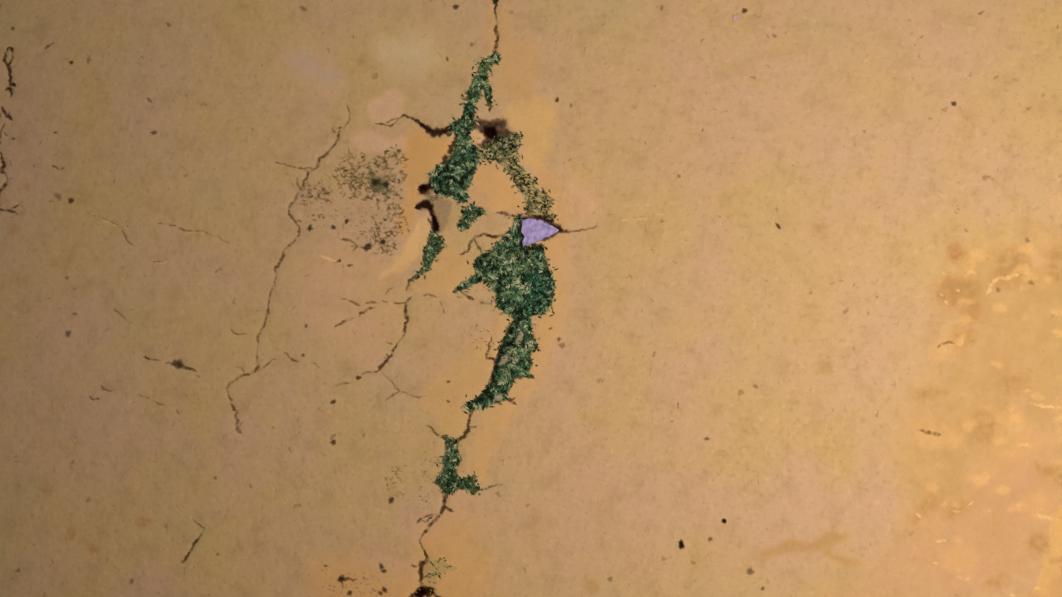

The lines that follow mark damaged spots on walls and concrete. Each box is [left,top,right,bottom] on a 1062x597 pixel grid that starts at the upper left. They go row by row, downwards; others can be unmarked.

crack [492,4,500,55]
crack [0,47,18,212]
crack [275,127,340,269]
mould [334,153,402,214]
peeling [386,184,463,274]
crack [376,98,550,255]
flaking render [470,119,510,147]
peeling [518,215,561,247]
crack [335,277,414,372]
crack [435,326,517,465]
crack [410,494,452,597]